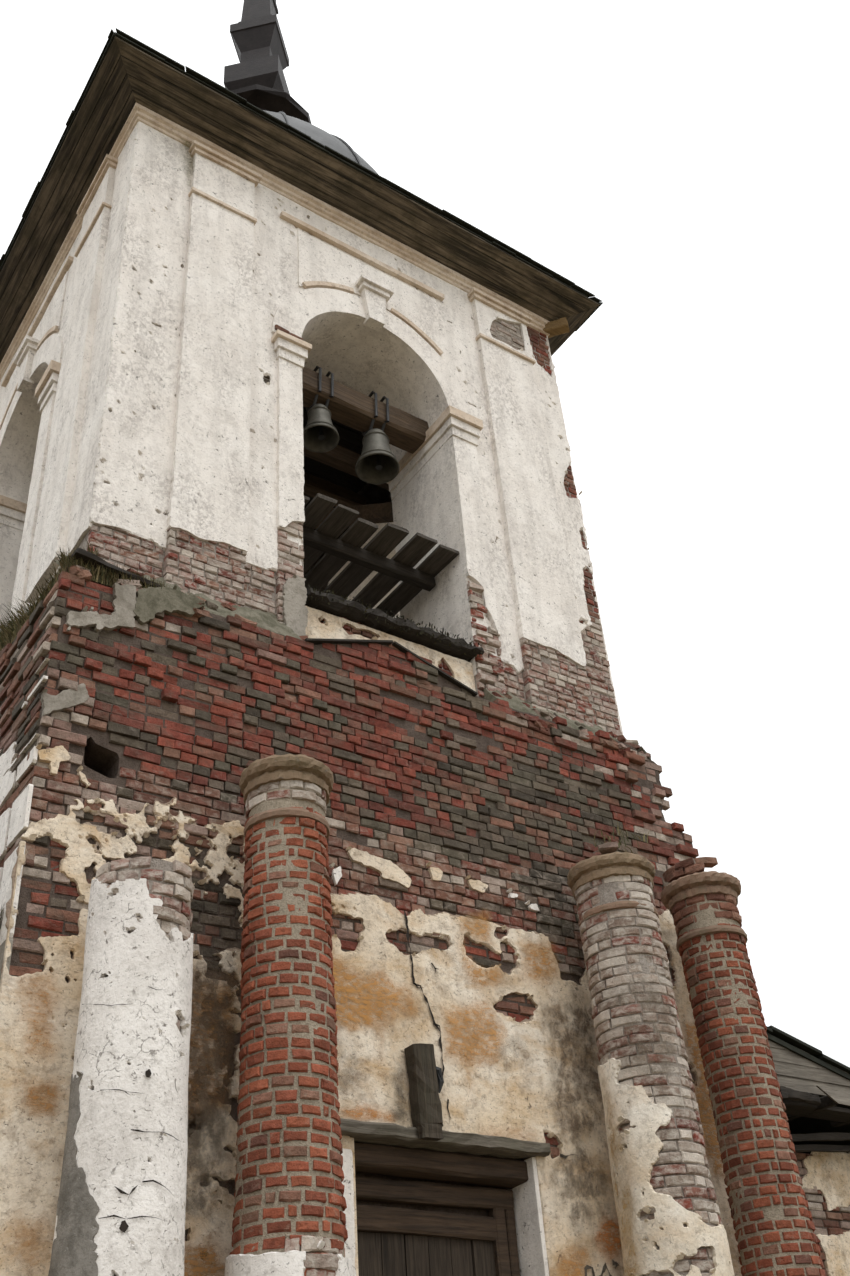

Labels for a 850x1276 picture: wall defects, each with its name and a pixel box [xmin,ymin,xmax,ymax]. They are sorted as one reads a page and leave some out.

spalling [490,316,552,376]
spalling [579,566,600,624]
spalling [79,798,245,972]
spalling [331,908,364,951]
spalling [385,929,447,956]
spalling [463,925,518,975]
crack [404,910,451,1118]
spalling [493,994,537,1022]
leakage [186,967,230,1212]
leakage [549,1007,605,1215]
crack [99,1180,174,1219]
spalling [630,1236,718,1276]